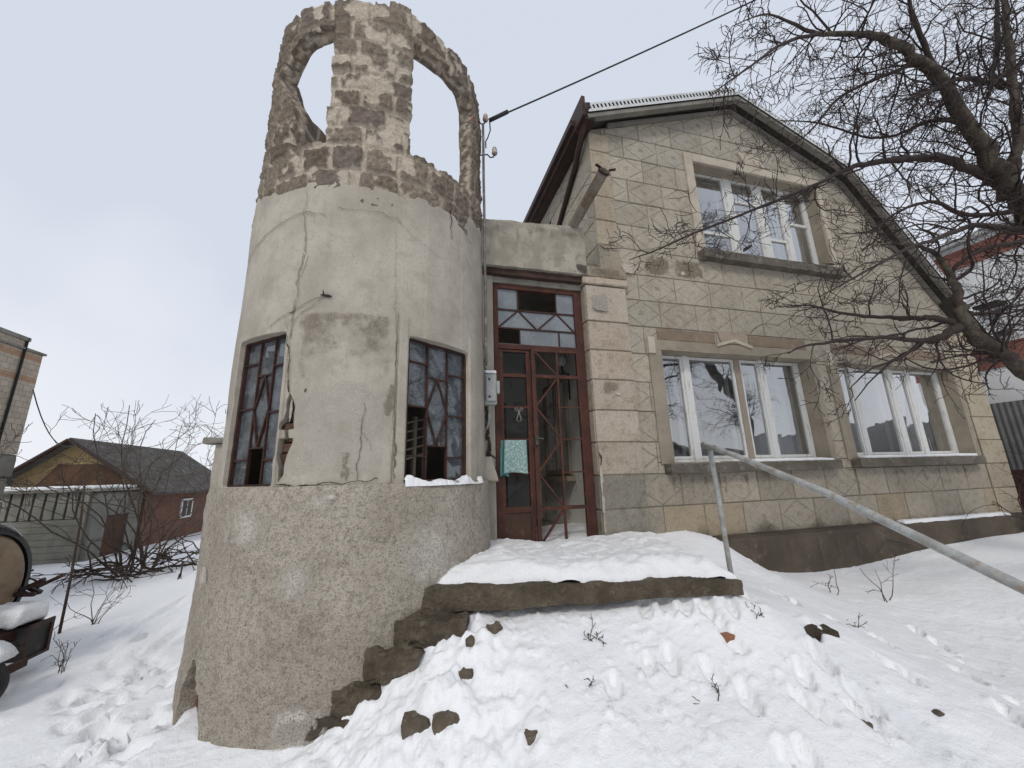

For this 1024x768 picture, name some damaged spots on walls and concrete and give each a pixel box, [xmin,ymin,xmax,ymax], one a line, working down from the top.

crack [248,191,442,487]